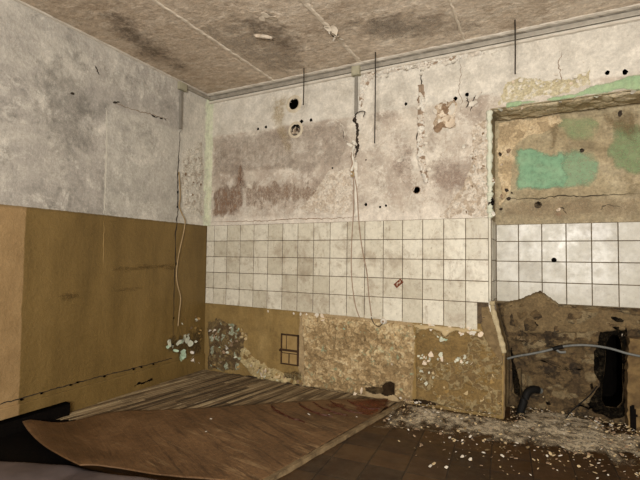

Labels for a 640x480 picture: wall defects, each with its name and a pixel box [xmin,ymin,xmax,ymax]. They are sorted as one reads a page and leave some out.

crack [103,101,166,270]
crack [173,133,181,291]
damp [213,166,316,215]
flaking render [433,99,457,133]
peeling [486,65,640,218]
crack [511,193,637,216]
crack [0,343,174,405]
flaking render [235,291,640,423]